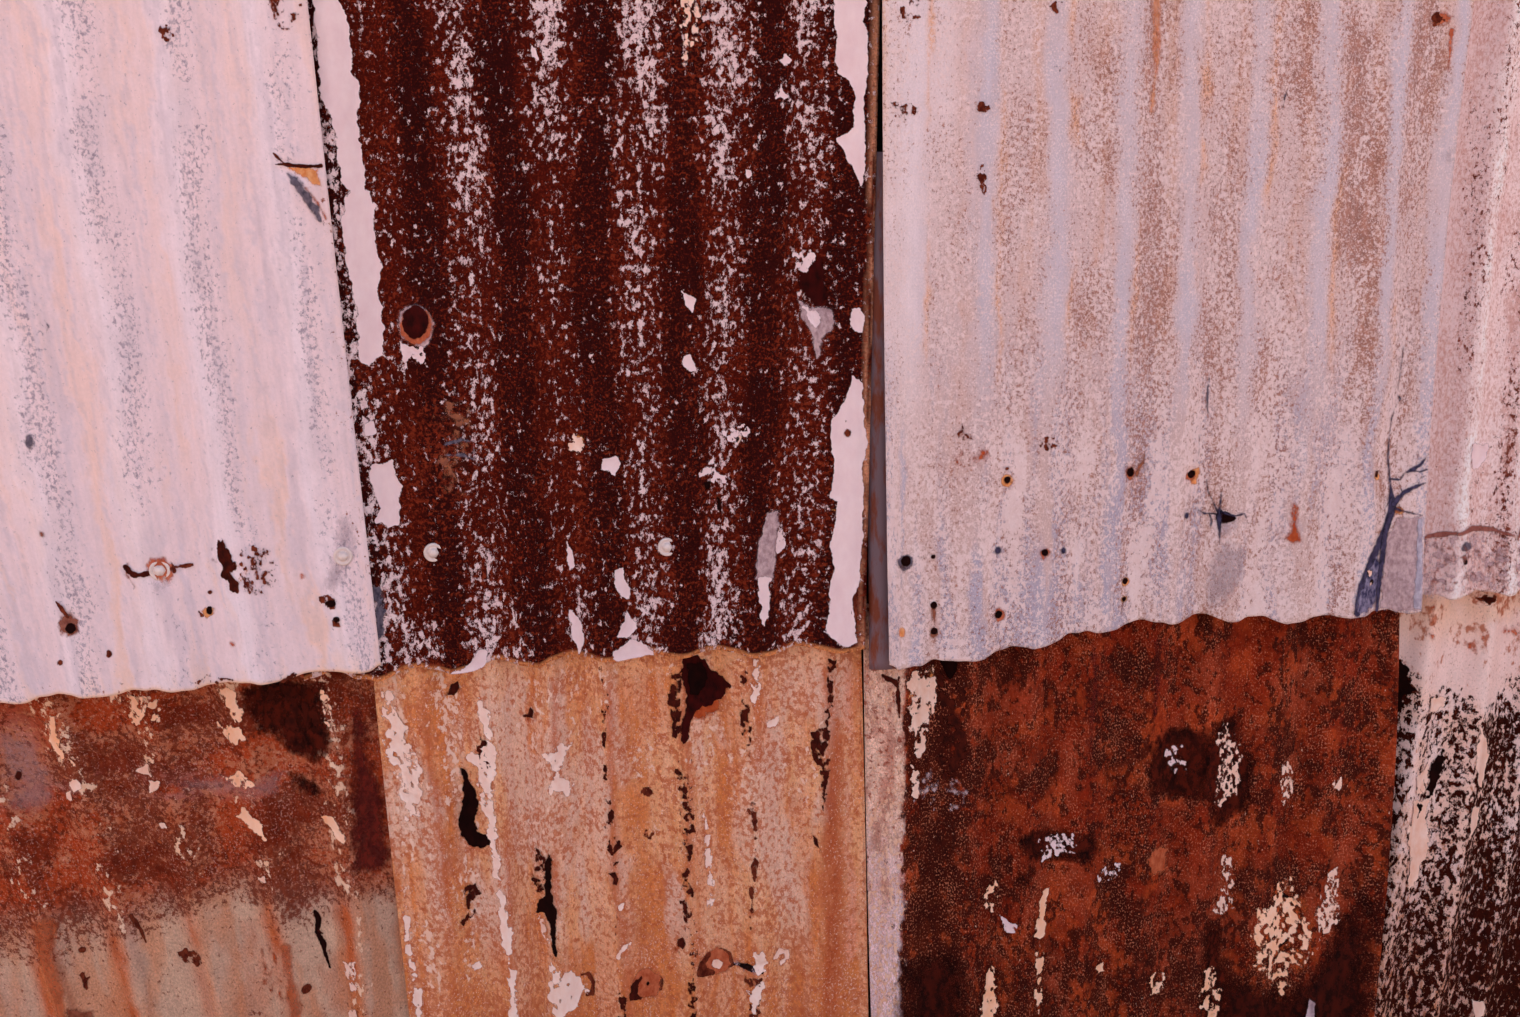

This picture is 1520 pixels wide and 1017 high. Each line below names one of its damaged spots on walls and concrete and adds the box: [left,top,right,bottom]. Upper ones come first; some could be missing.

peeling [833,0,868,186]
peeling [312,0,426,375]
rust [792,249,834,358]
peeling [369,459,403,528]
peeling [755,511,786,626]
peeling [824,376,868,647]
rust [195,672,330,795]
rust [810,659,837,811]
rust [1148,639,1256,834]
rust [1016,828,1101,886]
rust [1200,898,1379,1017]
peeling [1250,867,1340,996]